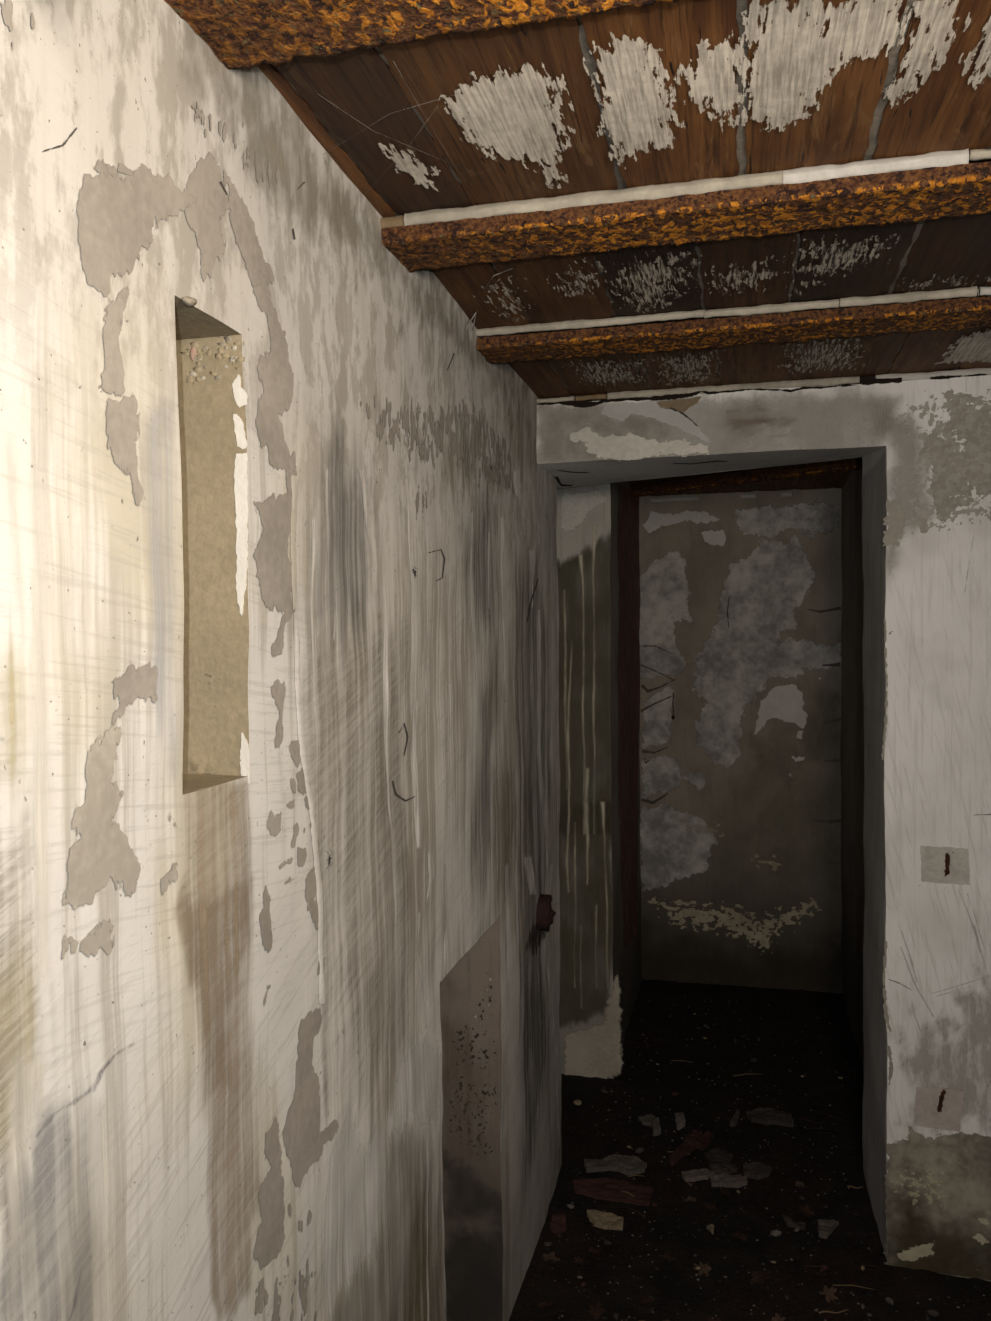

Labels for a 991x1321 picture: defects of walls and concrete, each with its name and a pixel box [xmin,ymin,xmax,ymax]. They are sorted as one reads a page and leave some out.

peeling [439,62,576,189]
peeling [583,32,747,169]
peeling [880,0,991,109]
peeling [77,101,297,657]
peeling [62,662,158,910]
leakage [309,435,409,1050]
leakage [178,786,254,1307]
leakage [448,972,497,1155]
leakage [35,1116,69,1220]
peeling [254,1008,339,1321]
leakage [338,1135,503,1321]
leakage [896,1202,991,1281]